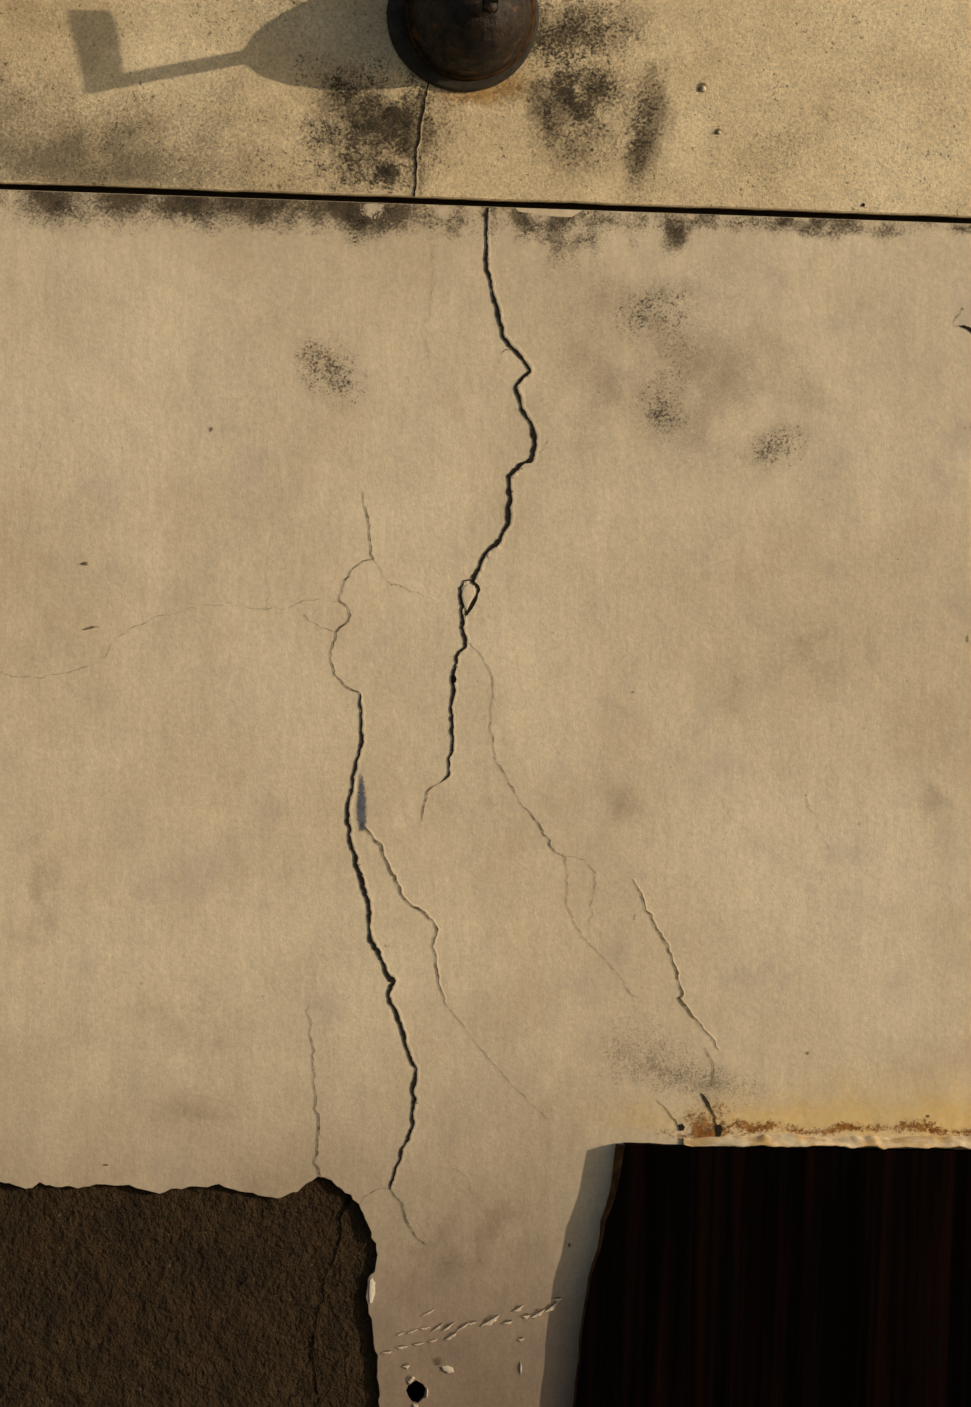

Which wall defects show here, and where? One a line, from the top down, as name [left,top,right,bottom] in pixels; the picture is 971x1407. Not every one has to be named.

water stain [286,51,464,193]
crack [413,83,431,197]
water stain [510,0,666,191]
crack [422,207,637,997]
crack [304,492,551,1407]
crack [632,878,723,1137]
corrosion [657,1103,971,1142]
spalling [0,1177,562,1407]